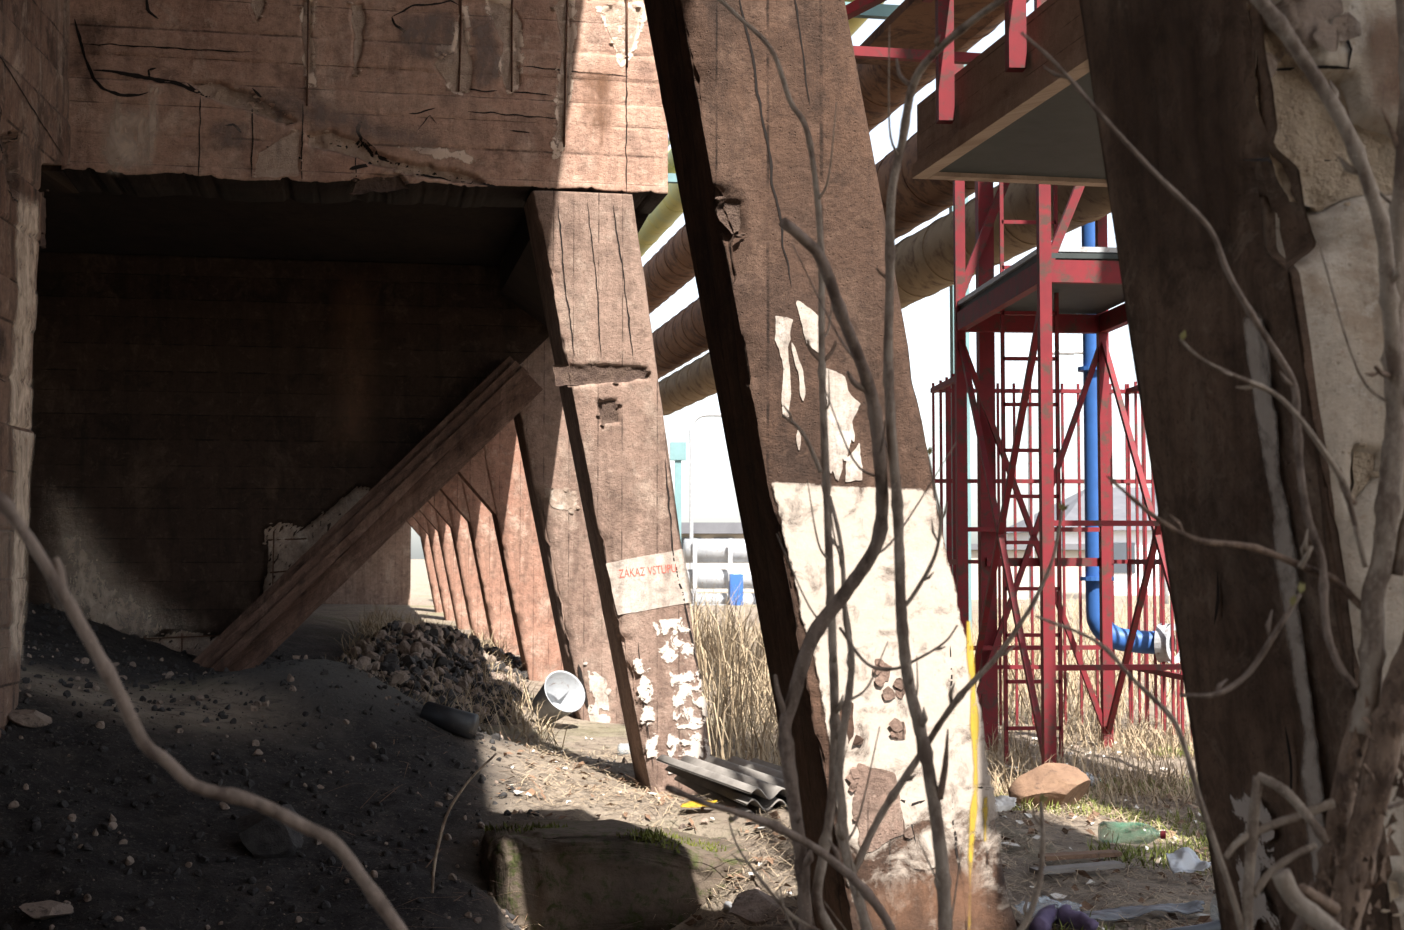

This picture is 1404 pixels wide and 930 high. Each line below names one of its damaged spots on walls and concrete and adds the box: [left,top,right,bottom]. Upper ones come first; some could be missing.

crack [74,0,497,187]
spalling [299,0,313,106]
spalling [252,129,481,195]
crack [468,66,633,356]
spalling [1246,0,1396,212]
peeling [633,617,711,774]